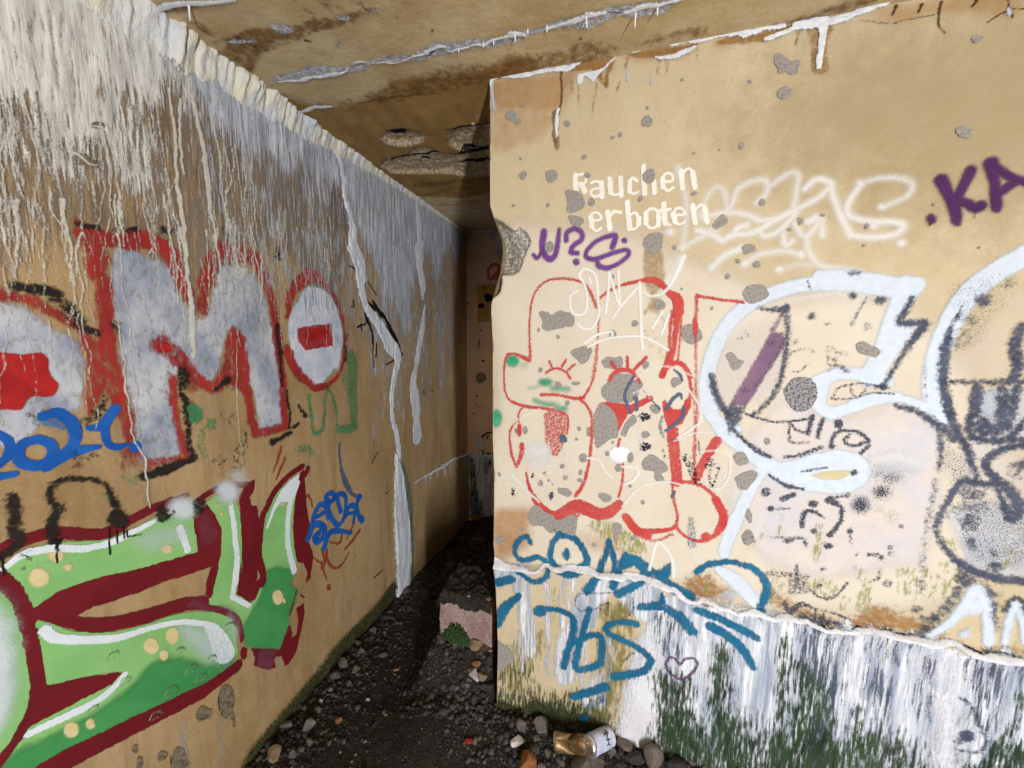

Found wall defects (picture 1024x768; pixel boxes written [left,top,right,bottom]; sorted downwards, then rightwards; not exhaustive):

crack [273,0,683,113]
damp [787,0,876,25]
spalling [379,117,490,177]
damp [0,0,615,582]
crack [349,265,403,368]
spalling [468,219,531,362]
damp [493,557,1024,768]